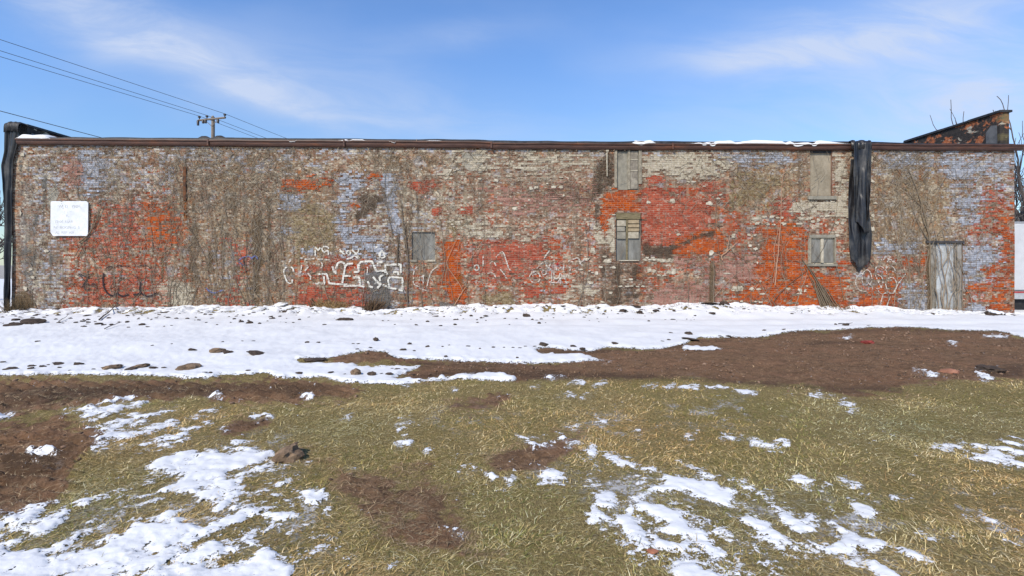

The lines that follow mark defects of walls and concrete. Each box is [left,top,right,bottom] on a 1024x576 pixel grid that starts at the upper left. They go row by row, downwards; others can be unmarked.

spalling [60,150,195,308]
spalling [275,150,928,310]
peeling [939,151,1015,313]